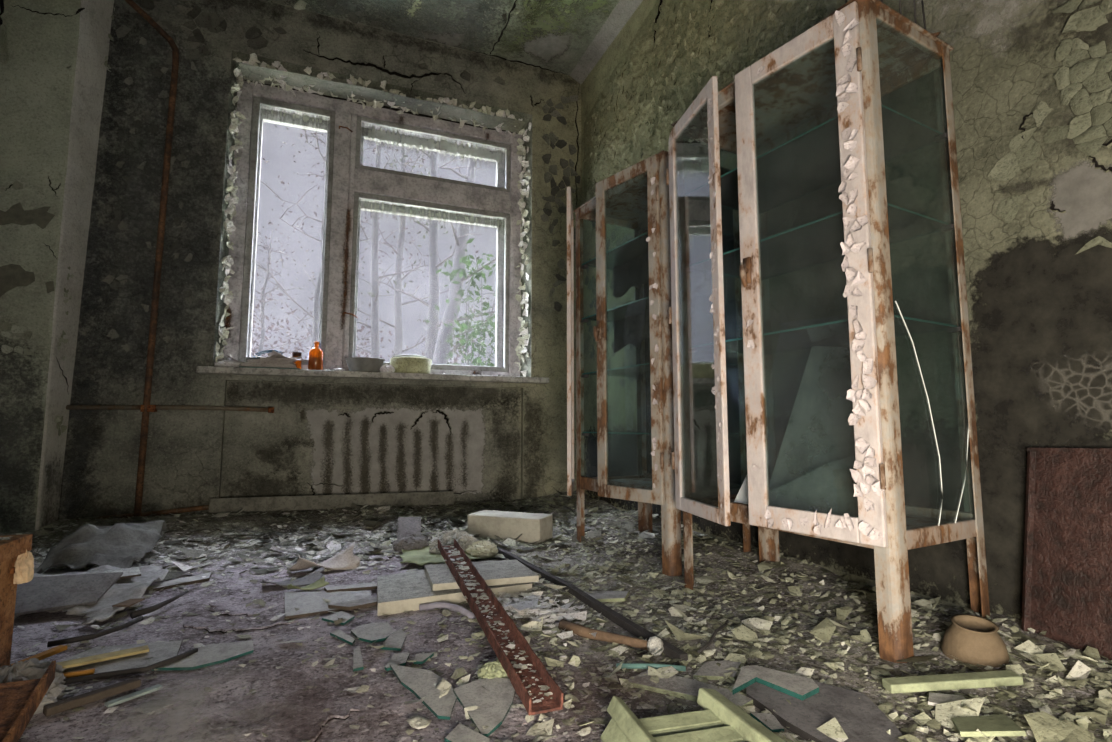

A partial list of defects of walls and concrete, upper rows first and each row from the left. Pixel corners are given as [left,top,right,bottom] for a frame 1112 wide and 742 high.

crack [0,0,85,68]
crack [239,31,544,134]
crack [473,51,580,209]
peeling [987,0,1112,255]
peeling [0,203,55,229]
peeling [215,0,828,377]
crack [337,409,452,435]
leakage [690,407,741,484]
leakage [774,405,857,499]
leakage [900,411,964,512]
leakage [969,227,1112,620]
leakage [779,531,876,581]